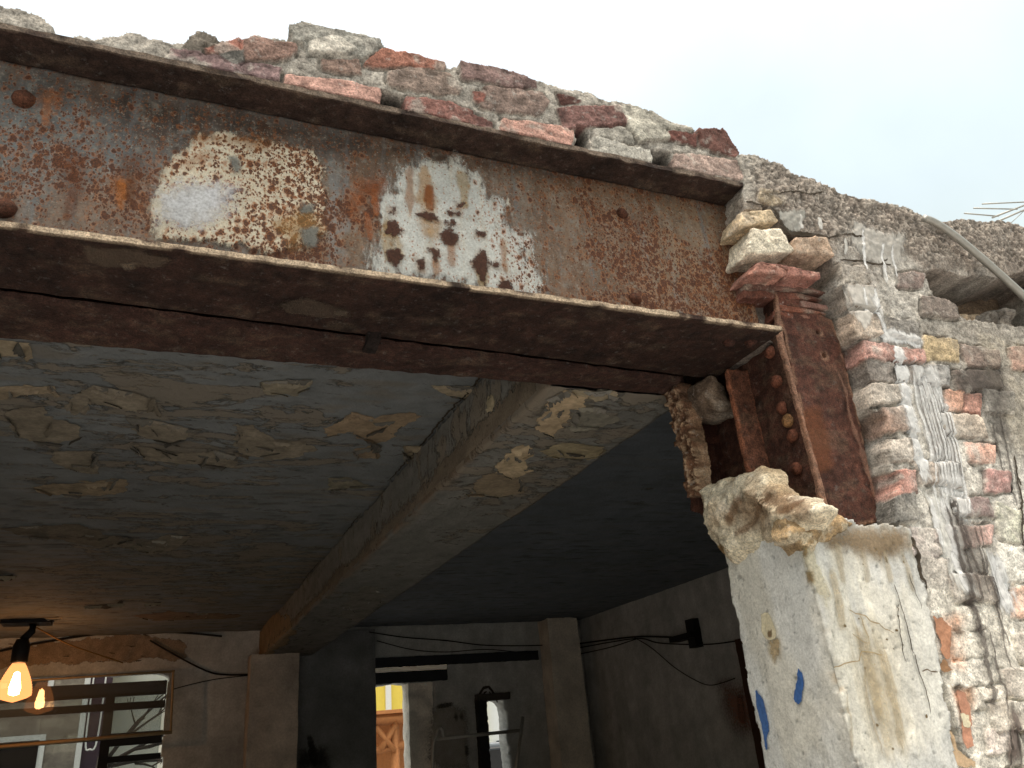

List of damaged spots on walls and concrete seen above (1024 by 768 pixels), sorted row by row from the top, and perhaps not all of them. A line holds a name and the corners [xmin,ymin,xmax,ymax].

peeling [150,131,328,254]
peeling [367,155,547,293]
efflorescence [779,209,805,232]
peeling [0,340,33,363]
peeling [0,385,162,417]
peeling [323,412,423,464]
peeling [494,389,620,480]
leakage [842,221,1023,765]
spalling [771,515,852,597]
crack [834,537,938,712]